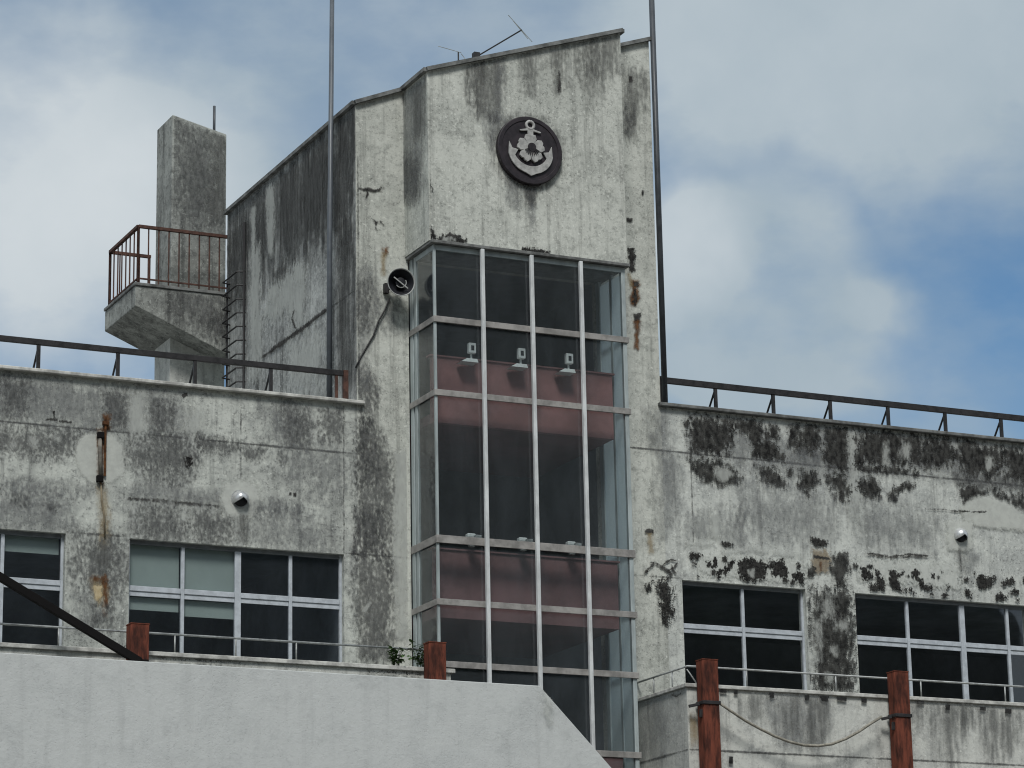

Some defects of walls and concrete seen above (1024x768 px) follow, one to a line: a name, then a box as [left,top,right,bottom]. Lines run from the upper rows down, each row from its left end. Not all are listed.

leakage [467,60,501,122]
leakage [167,113,354,378]
leakage [286,324,320,388]
corrosion [633,313,641,350]
leakage [103,389,266,465]
leakage [278,403,345,466]
leakage [683,412,1024,522]
leakage [352,452,408,639]
leakage [686,514,963,744]